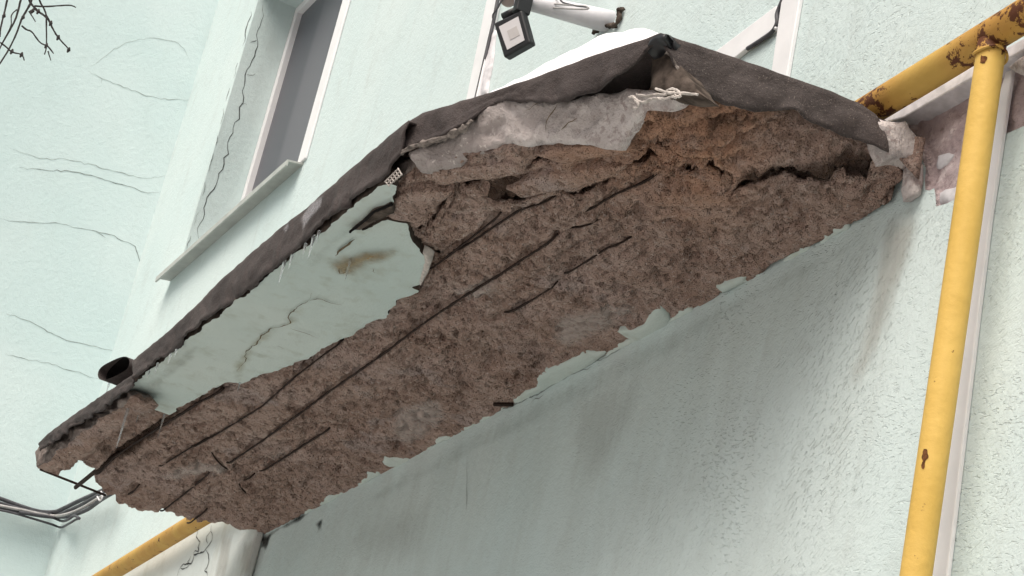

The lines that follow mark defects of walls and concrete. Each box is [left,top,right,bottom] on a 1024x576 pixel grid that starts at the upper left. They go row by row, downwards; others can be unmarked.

crack [94,38,186,100]
crack [187,8,264,246]
peeling [1001,72,1024,134]
crack [13,149,165,193]
crack [4,219,140,261]
crack [10,315,112,351]
crack [241,297,340,366]
spalling [39,98,969,534]